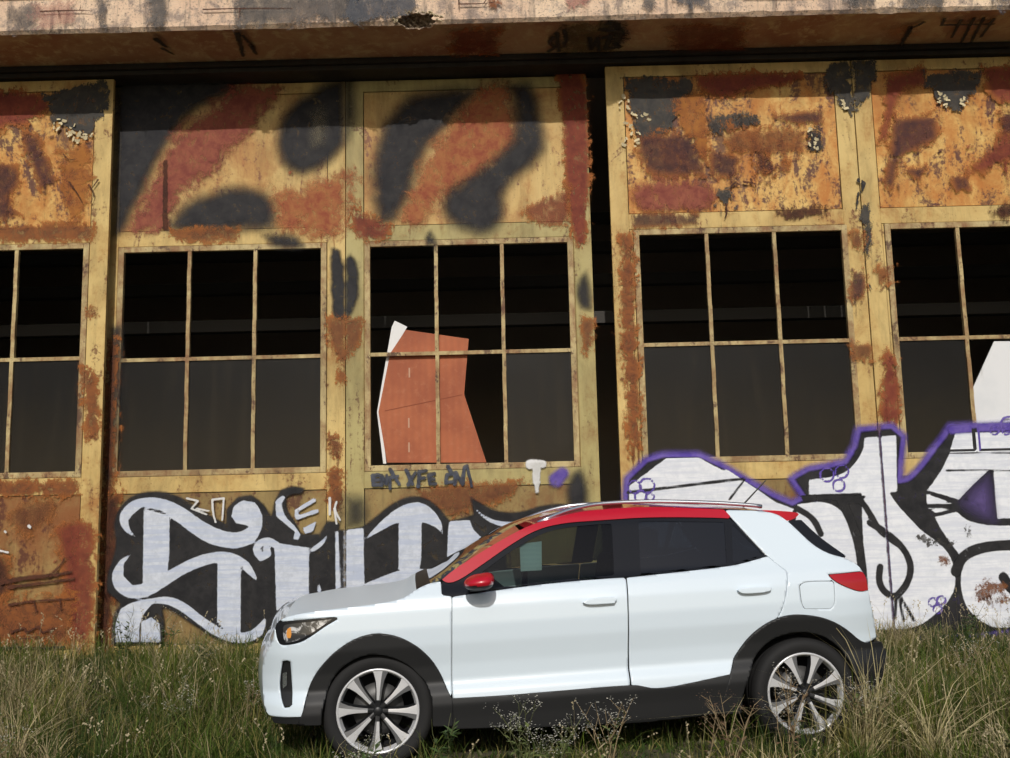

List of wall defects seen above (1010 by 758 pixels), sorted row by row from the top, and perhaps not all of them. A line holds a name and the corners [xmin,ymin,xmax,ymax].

corrosion [0,127,102,247]
peeling [40,79,114,144]
peeling [618,75,695,147]
peeling [806,124,824,153]
corrosion [879,107,944,194]
peeling [921,68,983,114]
corrosion [949,108,1010,192]
corrosion [614,89,828,465]
corrosion [77,363,103,443]
corrosion [849,338,904,427]
corrosion [0,474,102,653]